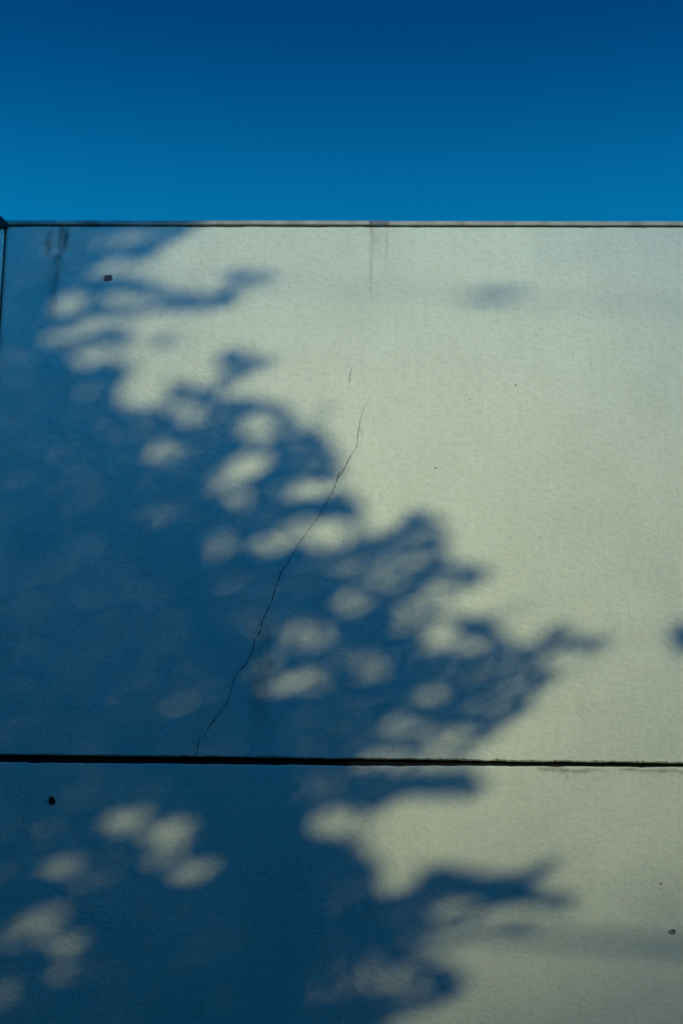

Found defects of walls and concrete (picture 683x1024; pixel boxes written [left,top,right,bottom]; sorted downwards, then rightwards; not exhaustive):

crack [196,402,368,755]